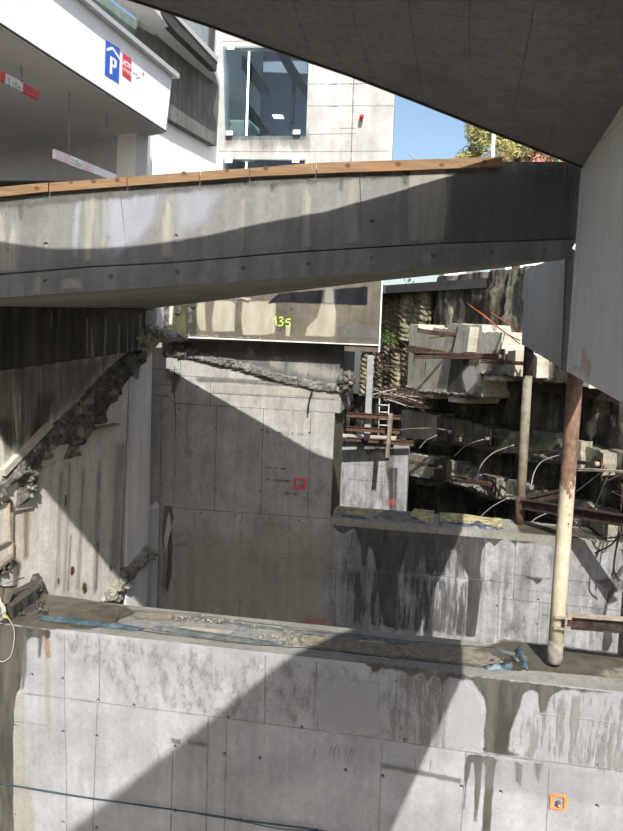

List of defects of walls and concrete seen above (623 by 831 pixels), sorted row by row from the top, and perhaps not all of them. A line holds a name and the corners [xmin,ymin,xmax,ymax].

spalling [0,306,562,507]
spalling [99,544,159,603]
leakage [334,524,556,637]
leakage [572,528,614,541]
leakage [597,566,623,617]
leakage [0,575,133,831]
leakage [367,656,605,831]
leakage [472,632,623,679]